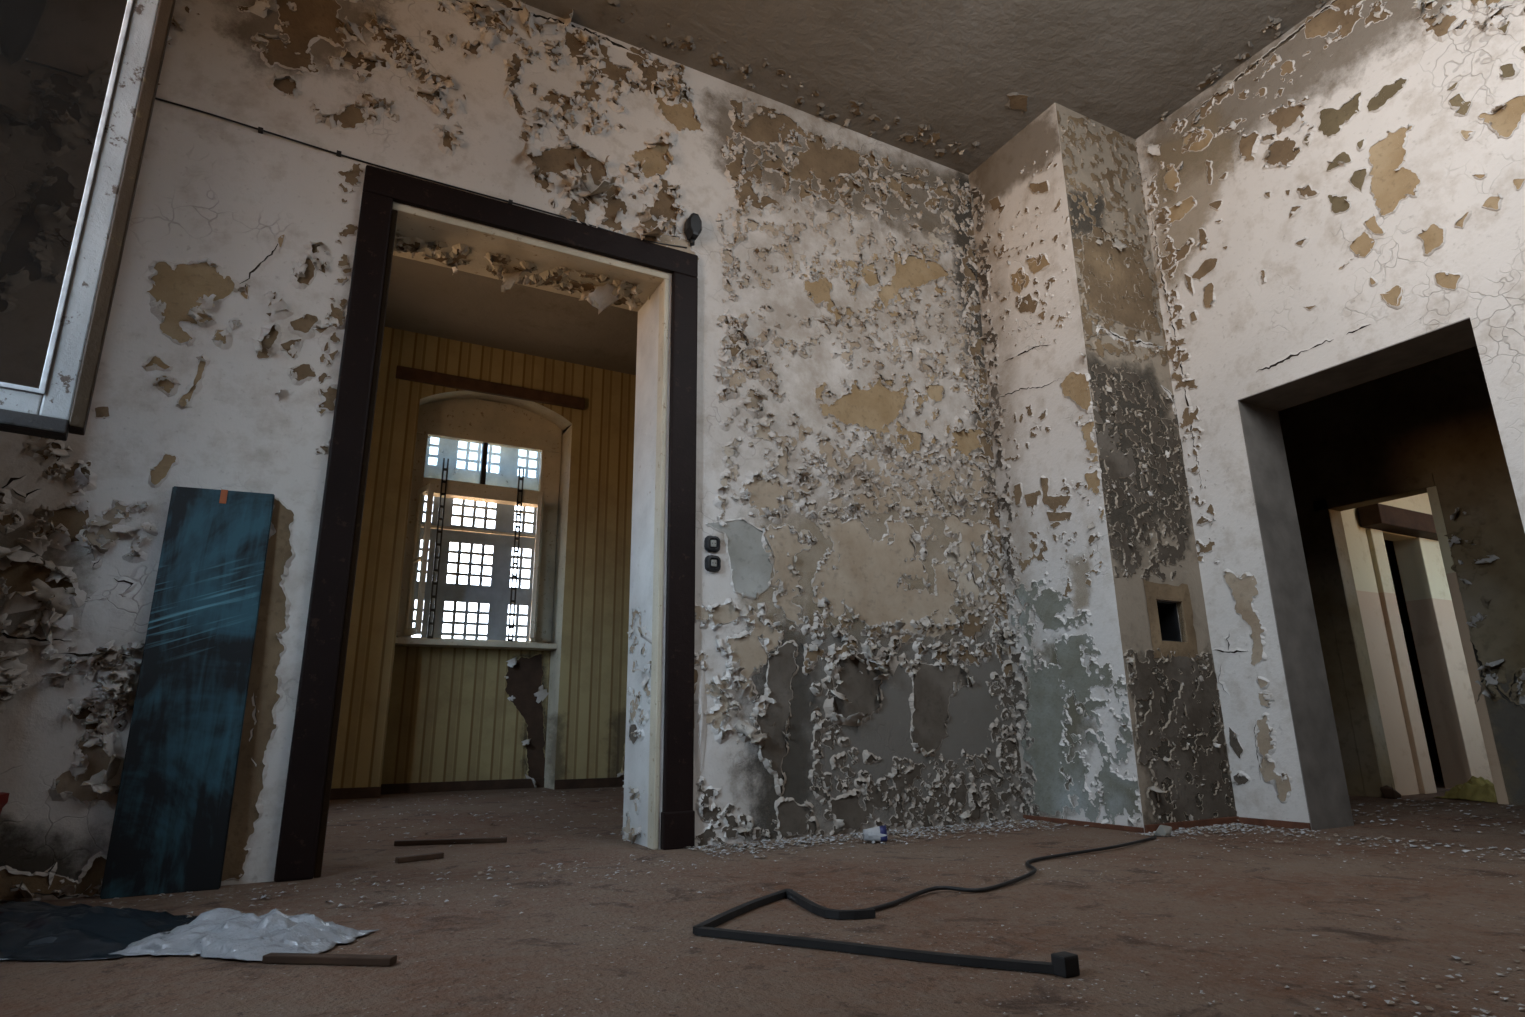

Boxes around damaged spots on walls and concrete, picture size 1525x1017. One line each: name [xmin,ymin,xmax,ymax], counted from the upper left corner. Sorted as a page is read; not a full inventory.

peeling [1412,0,1525,43]
peeling [1447,46,1525,141]
crack [239,235,286,300]
peeling [1417,178,1525,290]
peeling [141,224,358,417]
peeling [94,406,111,419]
peeling [237,0,1421,846]
peeling [1444,506,1500,630]
peeling [0,436,179,808]
peeling [1475,659,1525,704]
peeling [0,851,107,902]